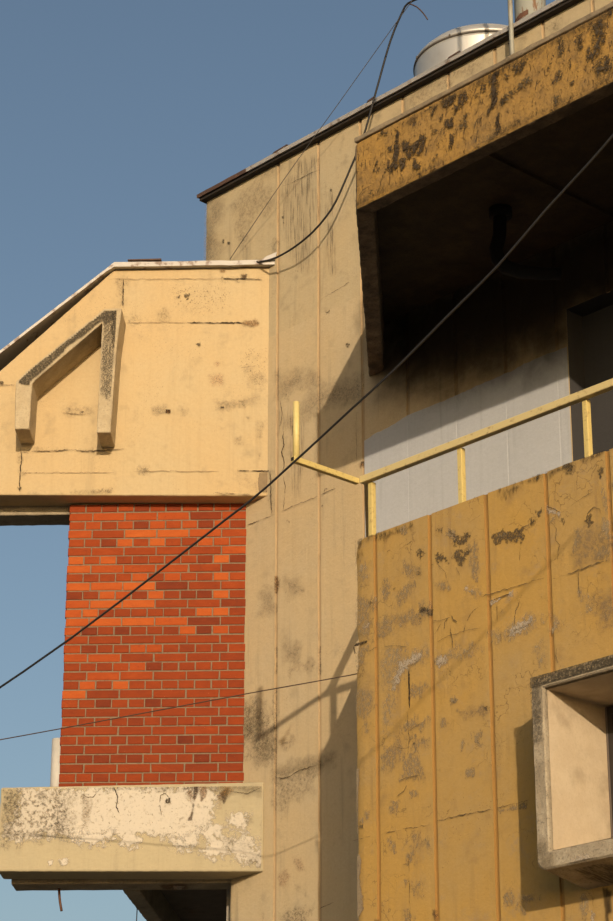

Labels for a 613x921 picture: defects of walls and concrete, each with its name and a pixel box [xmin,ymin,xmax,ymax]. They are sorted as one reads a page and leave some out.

spalling [435,528,481,595]
spalling [491,505,568,551]
peeling [573,468,613,559]
peeling [355,564,473,722]
peeling [0,786,261,867]